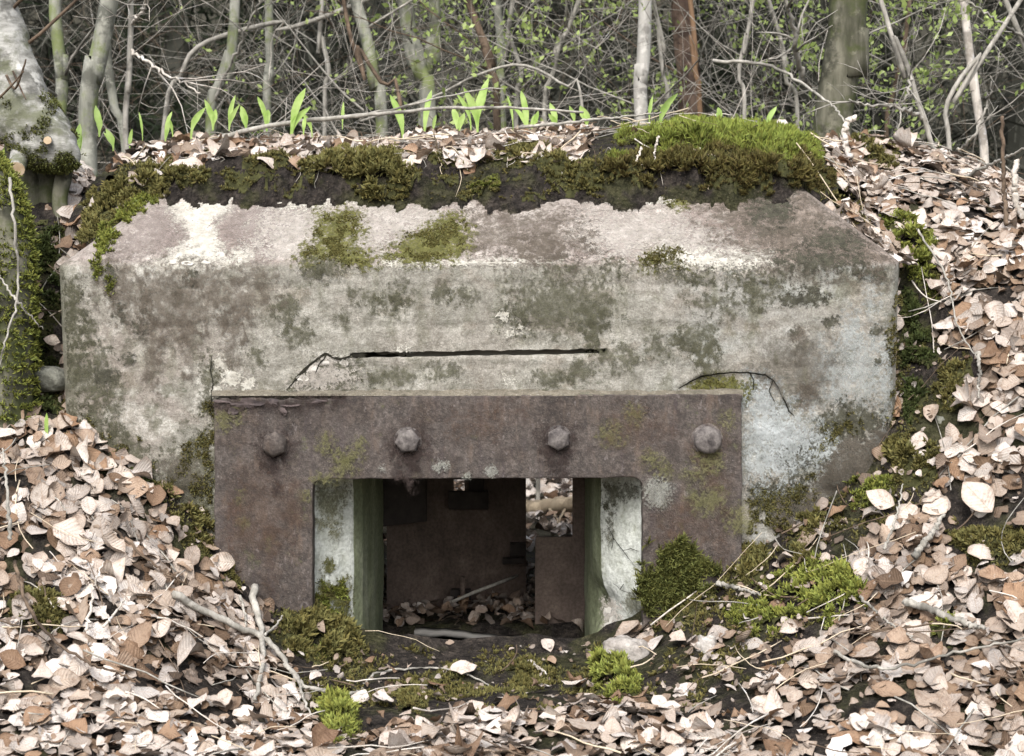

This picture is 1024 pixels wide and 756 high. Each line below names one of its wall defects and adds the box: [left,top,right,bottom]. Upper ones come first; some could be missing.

crack [287,352,412,389]
crack [586,347,605,355]
crack [678,372,795,417]
rust [250,427,303,498]
rust [381,420,432,491]
rust [533,423,577,491]